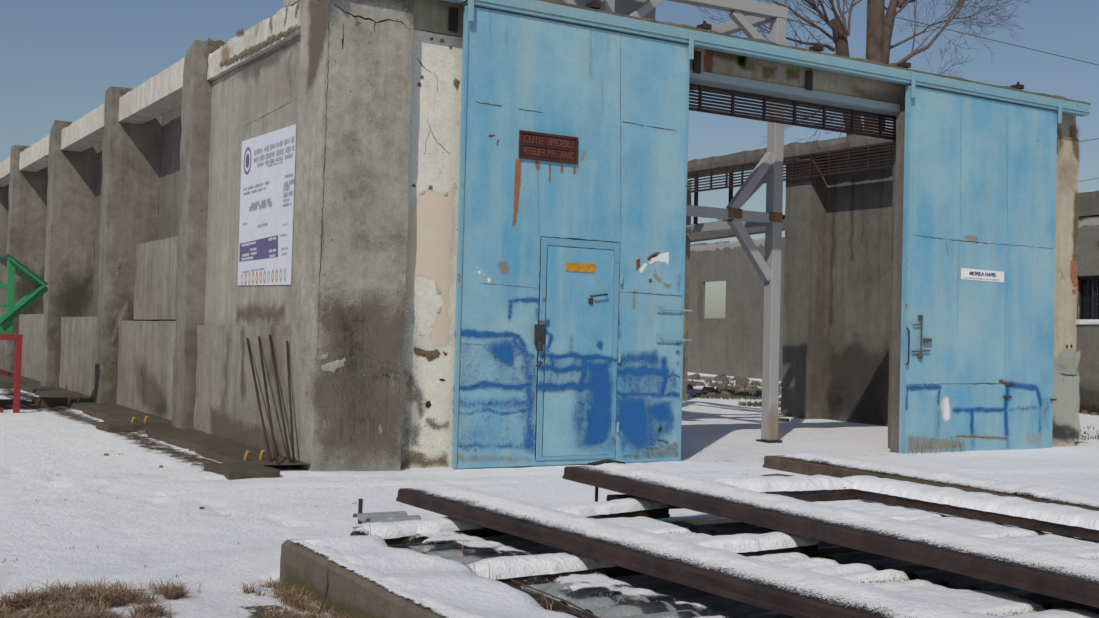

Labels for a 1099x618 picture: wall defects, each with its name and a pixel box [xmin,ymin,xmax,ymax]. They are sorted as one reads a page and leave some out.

damp [4,240,147,404]
damp [134,314,204,429]
damp [209,297,286,456]
crack [317,1,410,355]
damp [299,274,450,471]
peeling [406,184,457,362]
rust [512,158,522,226]
rust [535,152,586,184]
peeling [636,252,671,289]